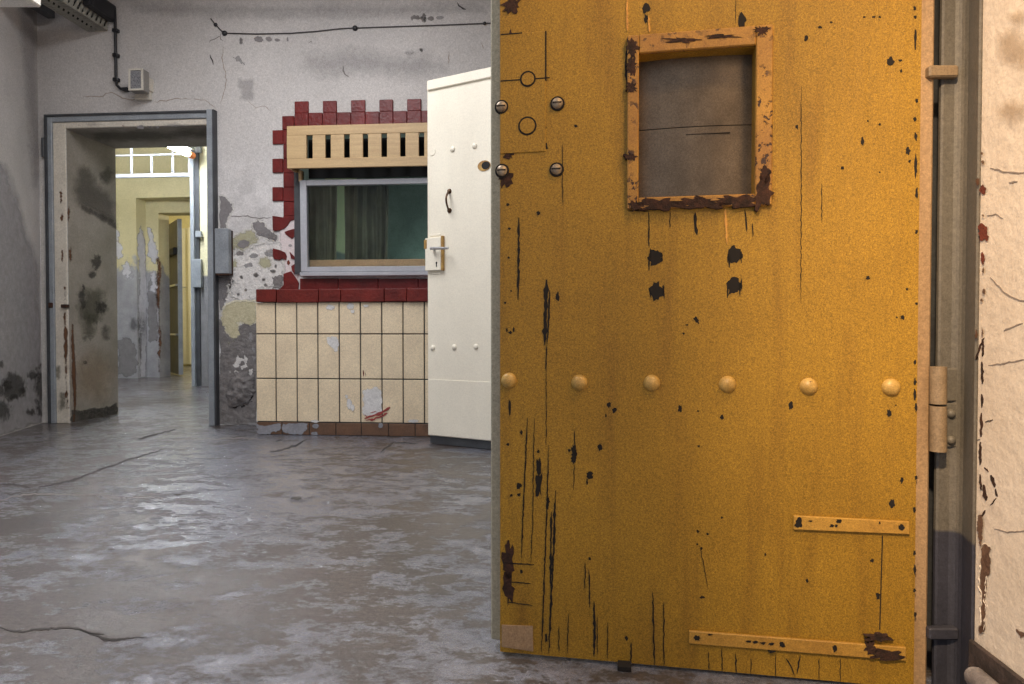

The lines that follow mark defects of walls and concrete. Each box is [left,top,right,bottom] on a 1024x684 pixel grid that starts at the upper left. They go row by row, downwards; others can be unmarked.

crack [85,34,271,112]
crack [991,168,1024,183]
water stain [0,165,42,435]
water stain [79,255,107,335]
spalling [218,194,319,435]
crack [0,429,307,505]
peeling [976,515,992,634]
crack [0,626,147,642]